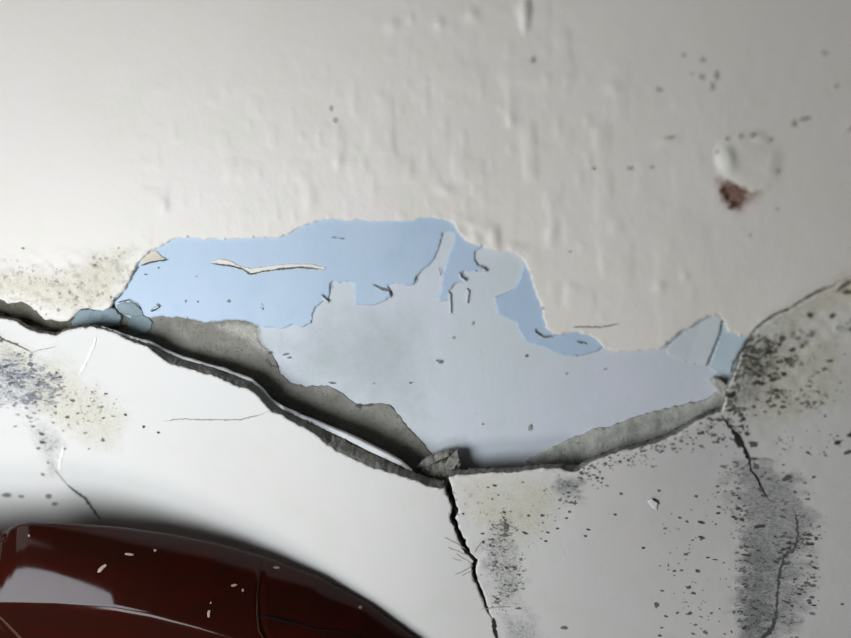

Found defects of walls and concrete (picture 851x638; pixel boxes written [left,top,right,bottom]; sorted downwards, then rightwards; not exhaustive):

corrosion [719,181,751,210]
crack [0,299,123,353]
leakage [0,338,127,450]
crack [163,411,270,422]
peeling [3,217,748,475]
mould [464,322,843,637]
crack [730,338,750,374]
crack [722,416,773,501]
crack [767,280,851,321]
crack [445,487,511,638]
crack [761,507,799,638]